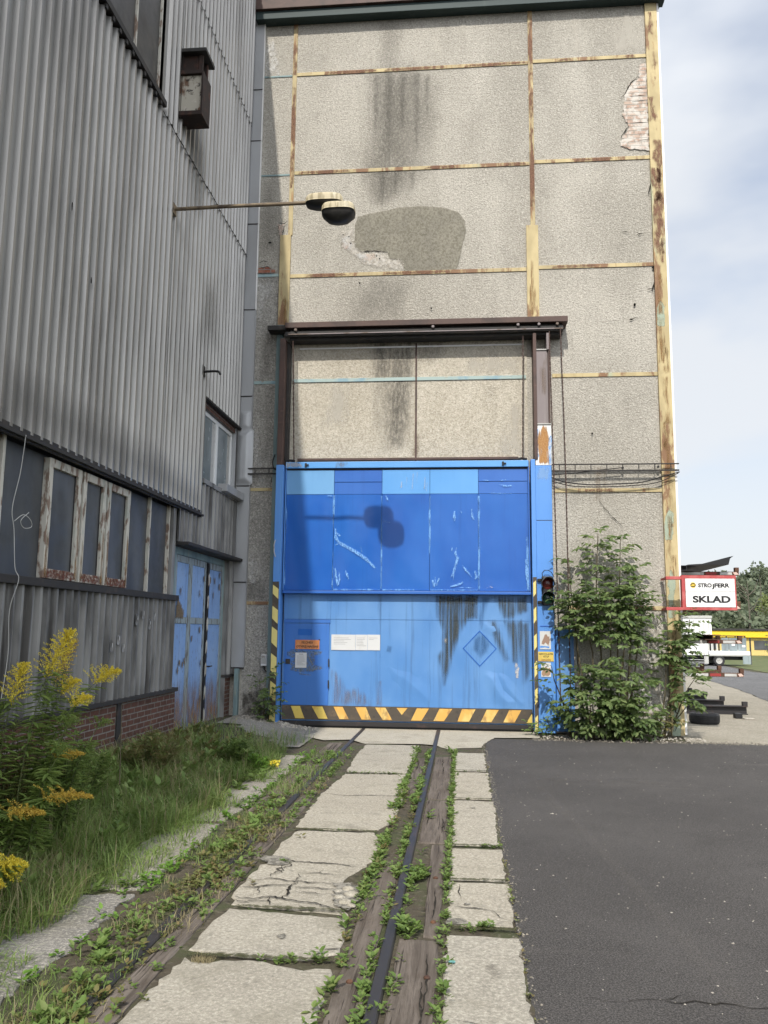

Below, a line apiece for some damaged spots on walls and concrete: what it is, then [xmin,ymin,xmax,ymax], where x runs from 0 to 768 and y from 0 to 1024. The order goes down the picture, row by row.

flaking render [620,63,650,151]
rust [651,140,664,282]
peeling [341,231,403,269]
rust [538,426,549,464]
crack [192,860,350,916]